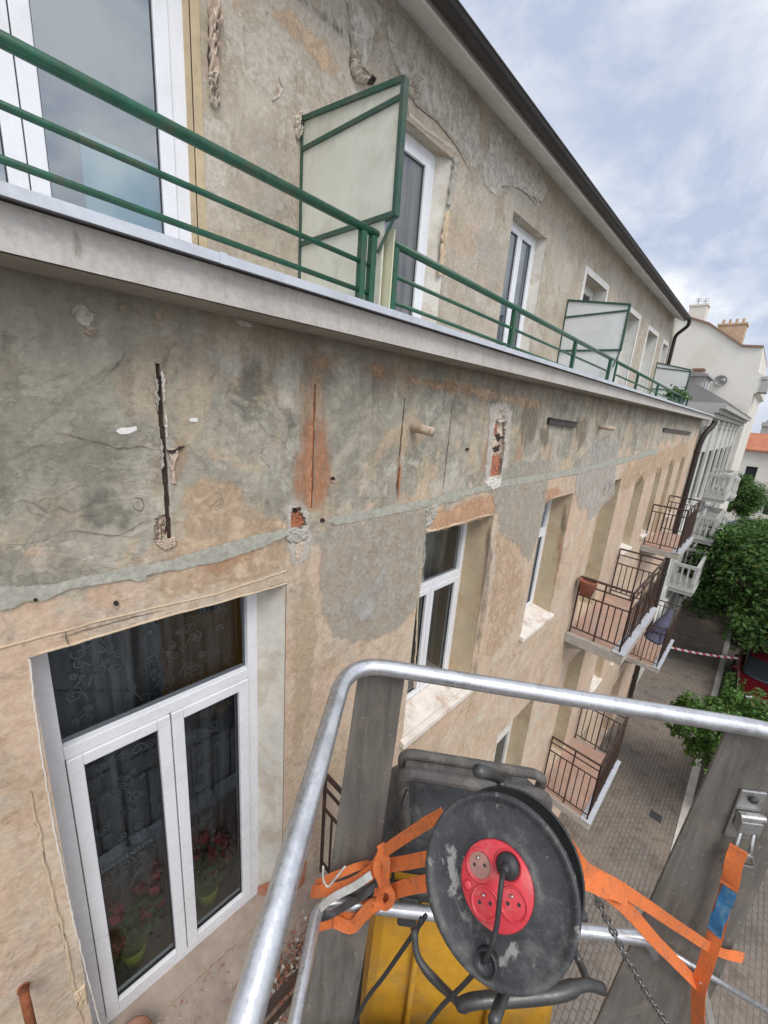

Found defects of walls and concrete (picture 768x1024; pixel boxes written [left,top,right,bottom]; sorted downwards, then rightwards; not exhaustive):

flaking render [207,0,223,109]
flaking render [346,0,548,276]
crack [0,363,185,550]
corrosion [294,384,329,506]
spalling [424,379,542,529]
flaking render [161,478,312,596]